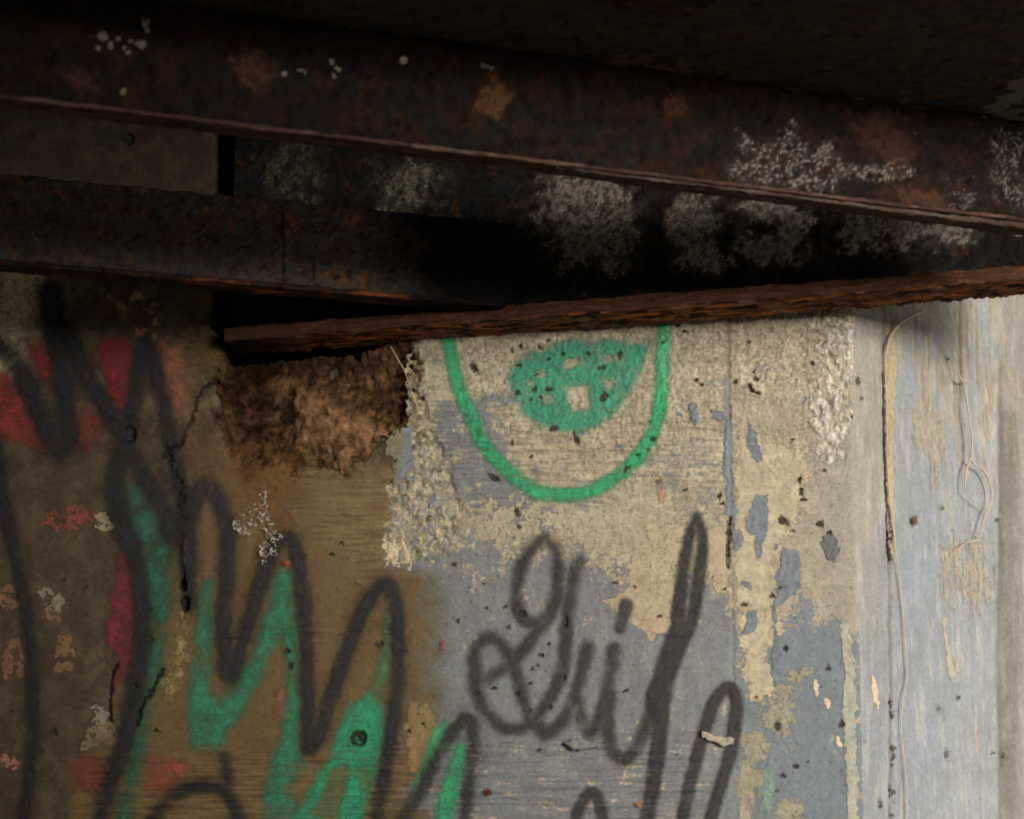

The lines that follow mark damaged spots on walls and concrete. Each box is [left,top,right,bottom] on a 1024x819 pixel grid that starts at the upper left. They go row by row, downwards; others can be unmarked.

corrosion [475,71,513,120]
damp [530,175,641,277]
damp [662,192,818,278]
efflorescence [728,119,915,194]
corrosion [846,108,945,208]
damp [834,214,975,257]
damp [944,176,976,211]
damp [980,69,1024,207]
crack [162,381,214,580]
spalling [211,339,867,819]